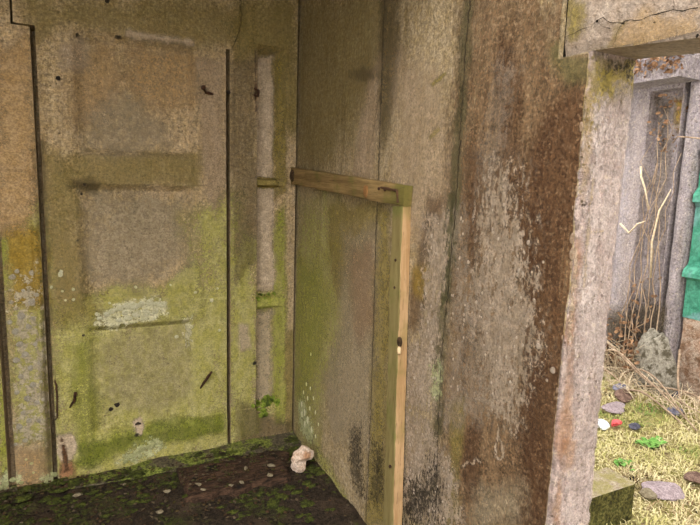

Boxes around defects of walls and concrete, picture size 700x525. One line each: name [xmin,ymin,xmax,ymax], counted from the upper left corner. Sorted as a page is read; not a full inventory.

crack [566,0,698,46]
leakage [1,151,207,349]
leakage [0,361,8,473]
corrosion [59,438,75,478]
leakage [316,426,386,509]